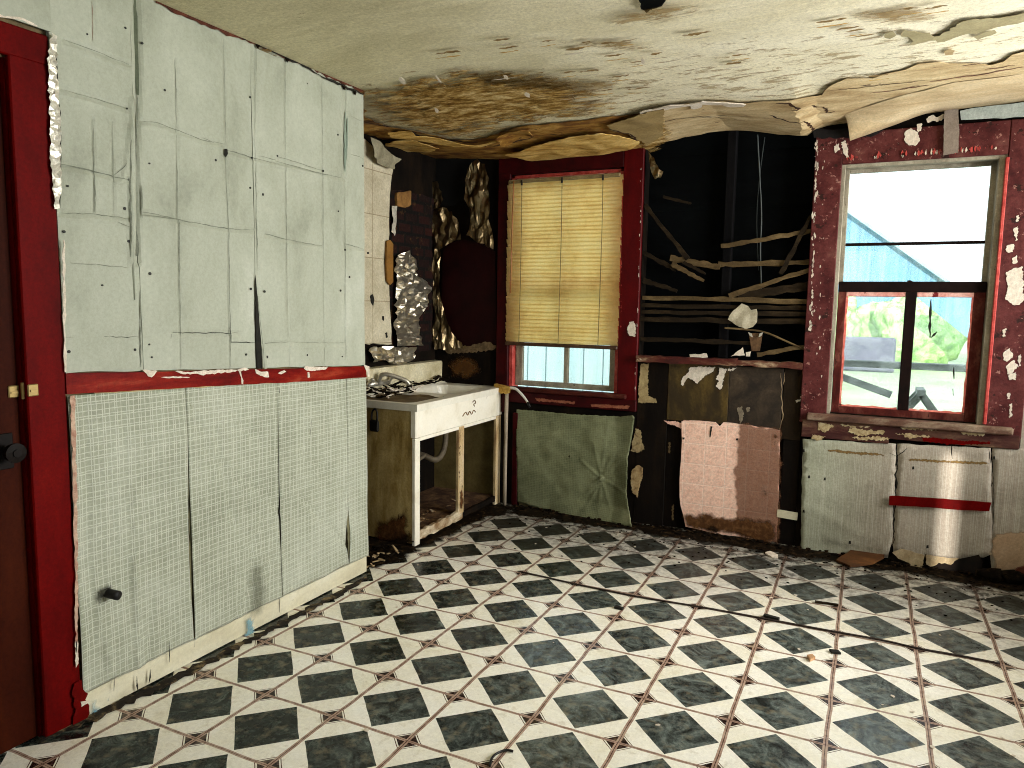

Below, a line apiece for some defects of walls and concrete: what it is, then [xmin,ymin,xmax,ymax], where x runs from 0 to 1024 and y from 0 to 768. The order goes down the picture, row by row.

damp [361,70,617,138]
crack [62,1,365,367]
peeling [808,74,1024,354]
peeling [143,368,286,384]
peeling [716,368,736,390]
peeling [1002,328,1021,380]
peeling [812,422,990,445]